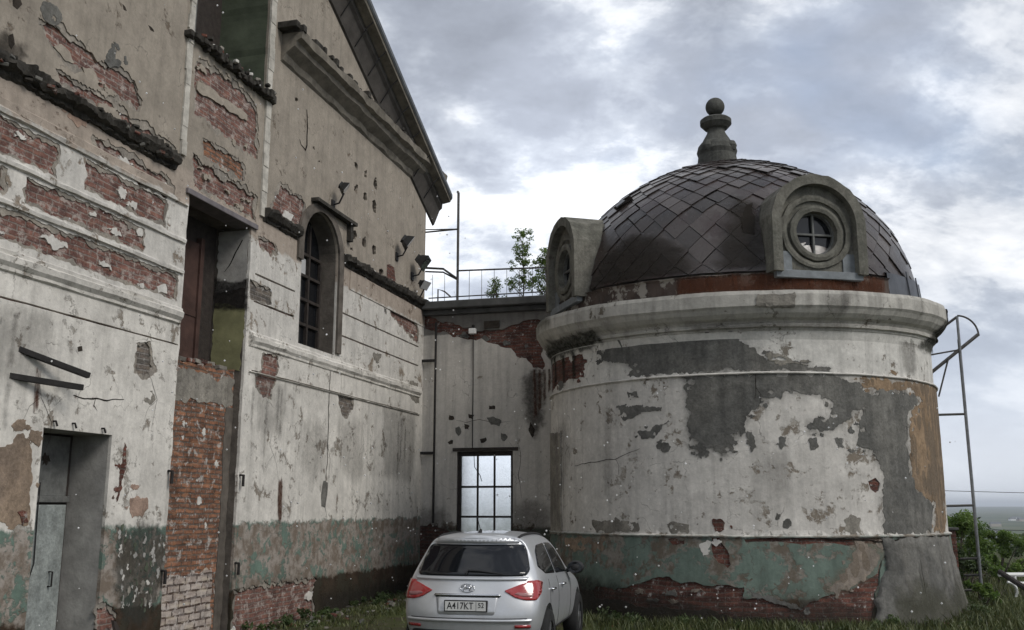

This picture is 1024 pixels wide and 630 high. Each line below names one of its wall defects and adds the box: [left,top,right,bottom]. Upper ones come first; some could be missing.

flaking render [0,19,178,301]
flaking render [192,34,277,222]
flaking render [0,419,51,530]
crack [73,395,124,410]
flaking render [133,341,157,405]
flaking render [255,353,278,400]
flaking render [448,414,474,444]
flaking render [384,309,587,393]
flaking render [854,370,946,533]
peeling [92,444,166,630]
flaking render [231,577,316,630]
flaking render [594,513,884,622]